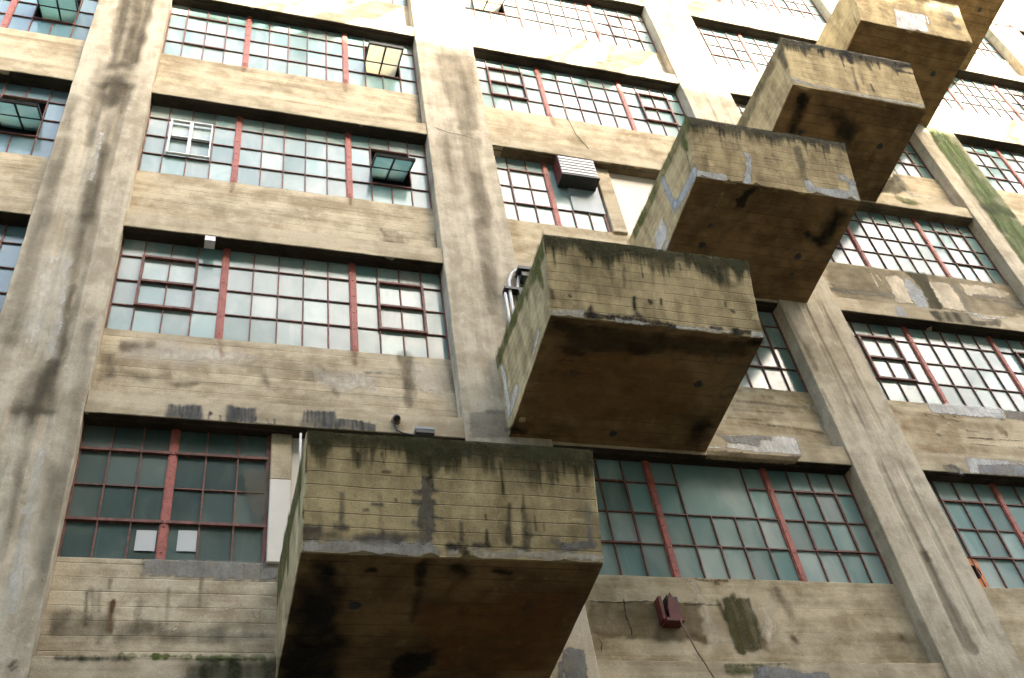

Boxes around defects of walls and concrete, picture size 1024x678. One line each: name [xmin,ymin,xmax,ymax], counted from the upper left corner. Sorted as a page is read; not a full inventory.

damp [924,125,1024,247]
damp [446,514,491,556]
damp [506,504,536,551]